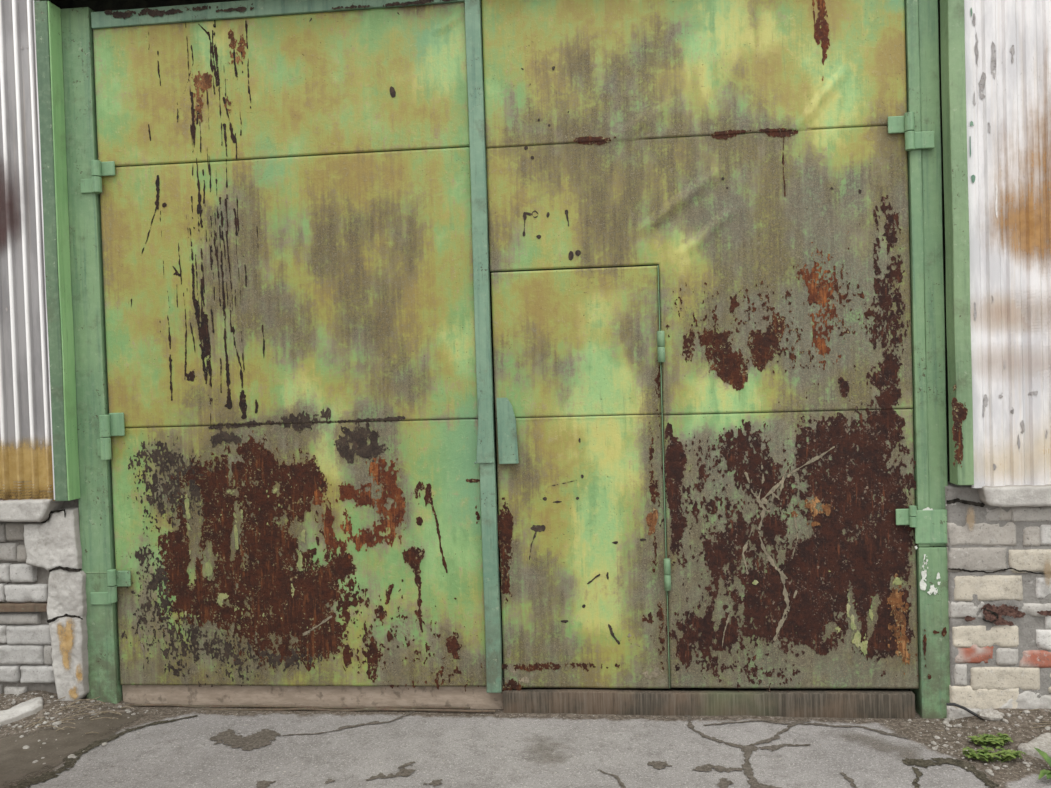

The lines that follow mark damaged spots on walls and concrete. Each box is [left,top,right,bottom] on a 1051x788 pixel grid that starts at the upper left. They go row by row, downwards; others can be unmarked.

corrosion [228,29,247,64]
corrosion [812,0,830,81]
corrosion [191,71,213,123]
corrosion [997,124,1051,260]
corrosion [659,194,918,692]
crack [41,509,66,523]
crack [49,565,81,573]
corrosion [121,430,479,692]
crack [47,614,83,623]
corrosion [502,662,620,691]